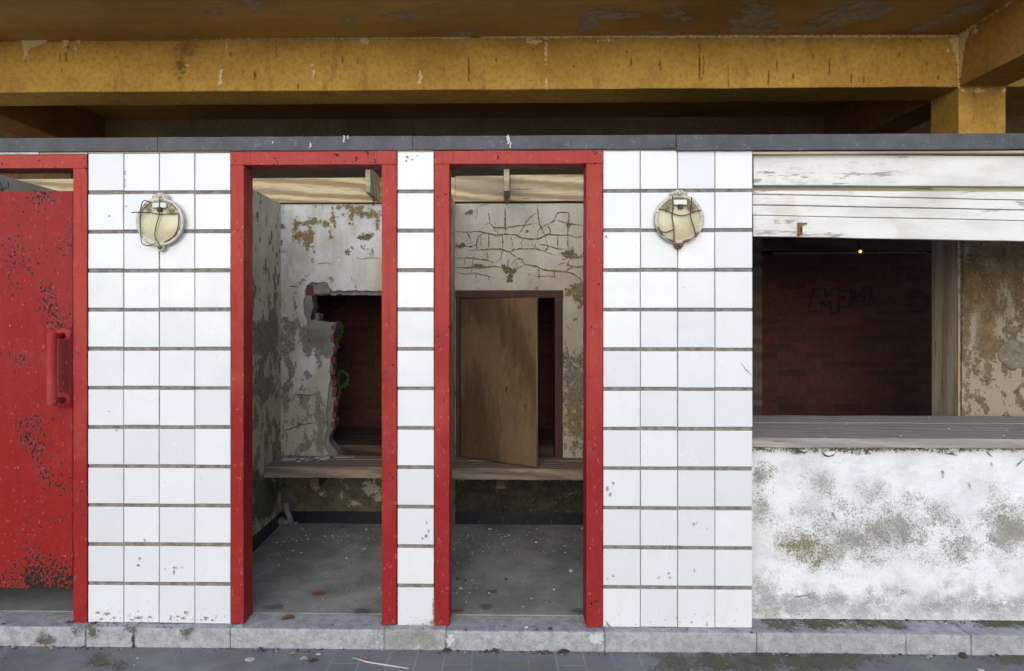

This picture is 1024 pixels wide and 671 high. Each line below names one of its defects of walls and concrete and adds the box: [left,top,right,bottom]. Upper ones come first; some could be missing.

peeling [281,204,382,252]
crack [456,204,583,286]
peeling [564,282,583,309]
peeling [962,268,1024,407]